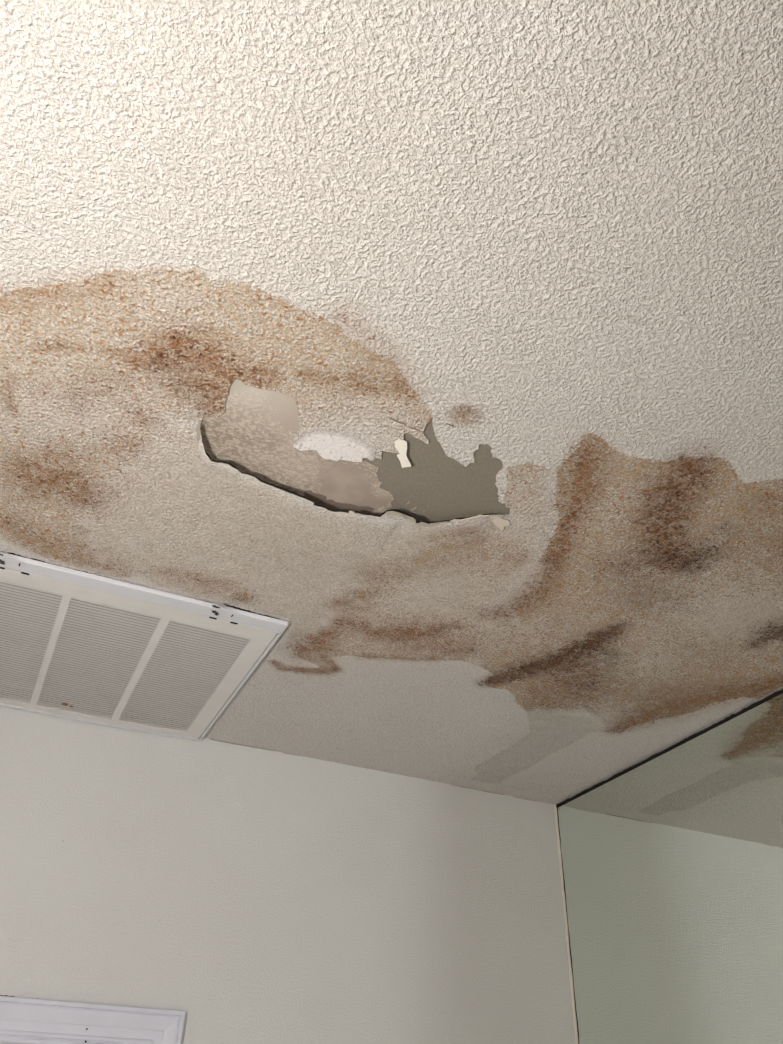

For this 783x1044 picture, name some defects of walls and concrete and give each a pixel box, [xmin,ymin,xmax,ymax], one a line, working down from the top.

leakage [0,269,432,576]
peeling [196,378,510,530]
leakage [271,433,783,733]